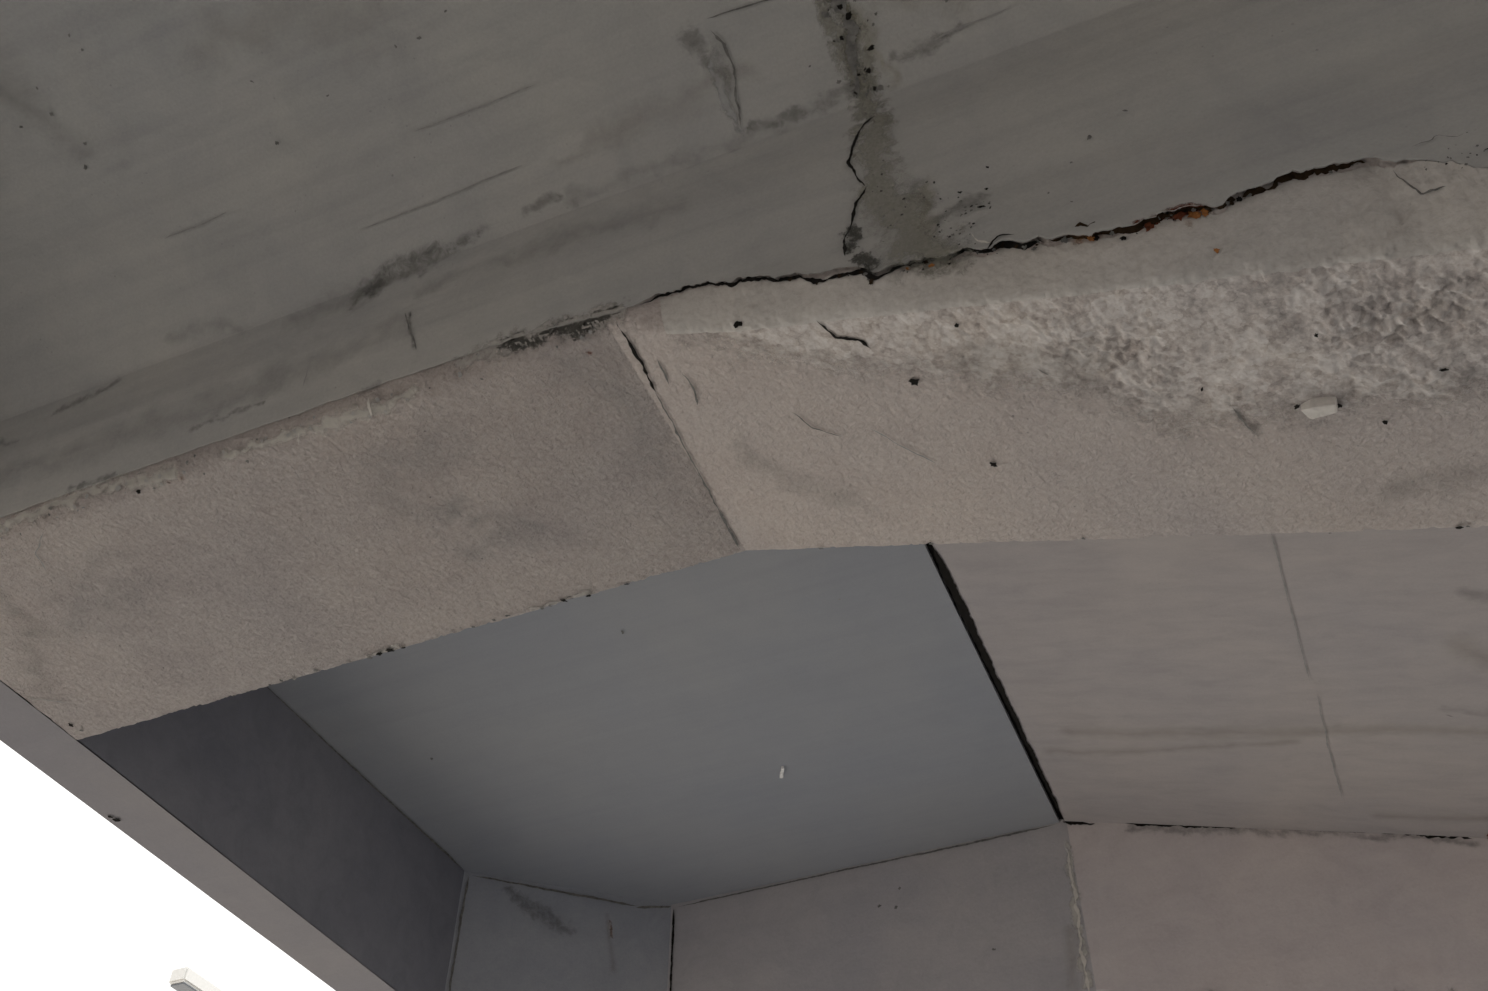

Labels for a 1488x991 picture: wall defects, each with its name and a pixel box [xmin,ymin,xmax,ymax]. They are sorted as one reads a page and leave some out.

spalling [815,0,890,115]
crack [617,0,1365,549]
spalling [660,132,1488,436]